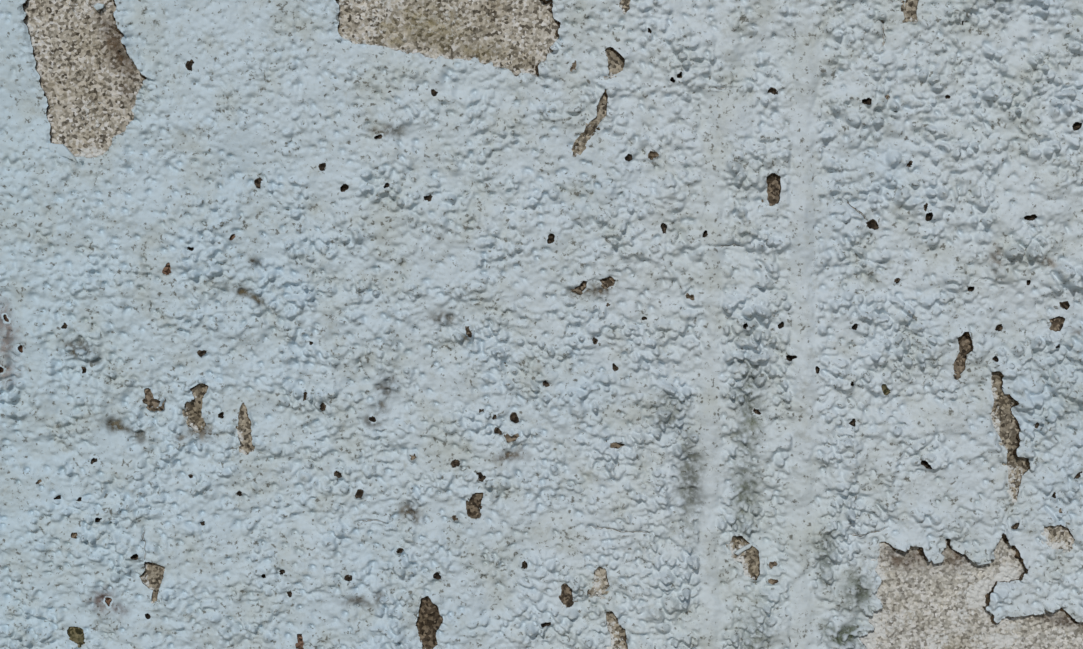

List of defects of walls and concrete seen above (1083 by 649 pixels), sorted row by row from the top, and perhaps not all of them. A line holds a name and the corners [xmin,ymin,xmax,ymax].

peeling [619,0,631,14]
peeling [335,0,561,77]
peeling [22,0,147,163]
peeling [572,47,625,157]
peeling [1049,316,1065,348]
peeling [182,383,209,434]
peeling [990,356,1030,503]
peeling [725,535,760,583]
peeling [1041,512,1075,553]
peeling [859,523,1083,649]
peeling [416,596,443,649]